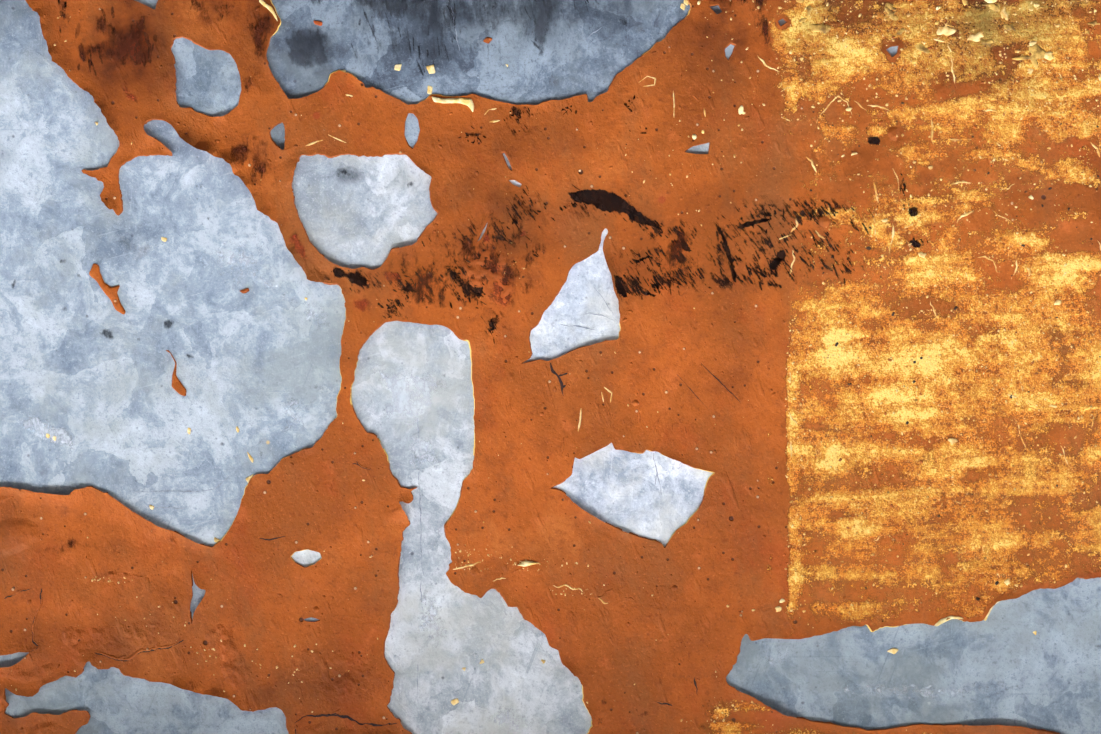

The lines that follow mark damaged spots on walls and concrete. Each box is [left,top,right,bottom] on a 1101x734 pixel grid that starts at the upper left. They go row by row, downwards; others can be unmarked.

peeling [0,0,729,734]
peeling [707,0,1101,734]